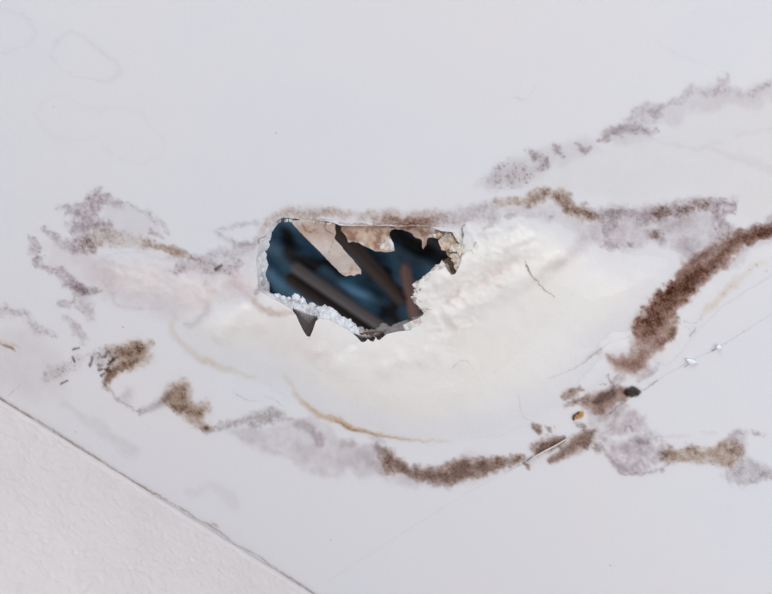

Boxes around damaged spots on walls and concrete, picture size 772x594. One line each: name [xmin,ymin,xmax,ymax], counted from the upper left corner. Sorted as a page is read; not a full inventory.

spalling [256,218,466,342]
damp [637,228,772,341]
damp [621,387,641,397]
damp [536,432,593,462]
damp [385,456,528,483]